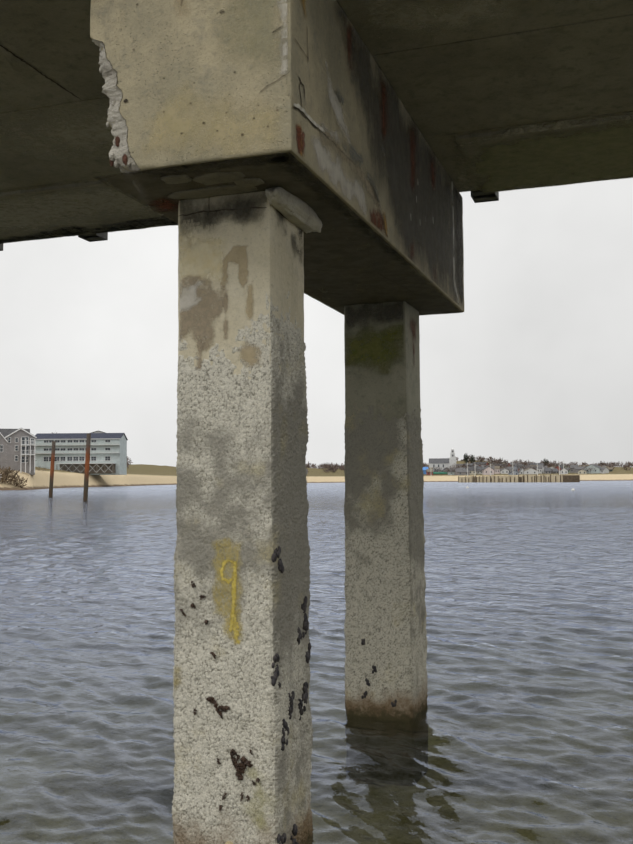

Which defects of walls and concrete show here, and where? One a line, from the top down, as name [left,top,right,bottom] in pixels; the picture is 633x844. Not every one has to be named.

spalling [92,39,140,173]
damp [0,0,585,327]
rust [296,124,305,157]
crack [262,26,354,163]
peeling [180,239,253,339]